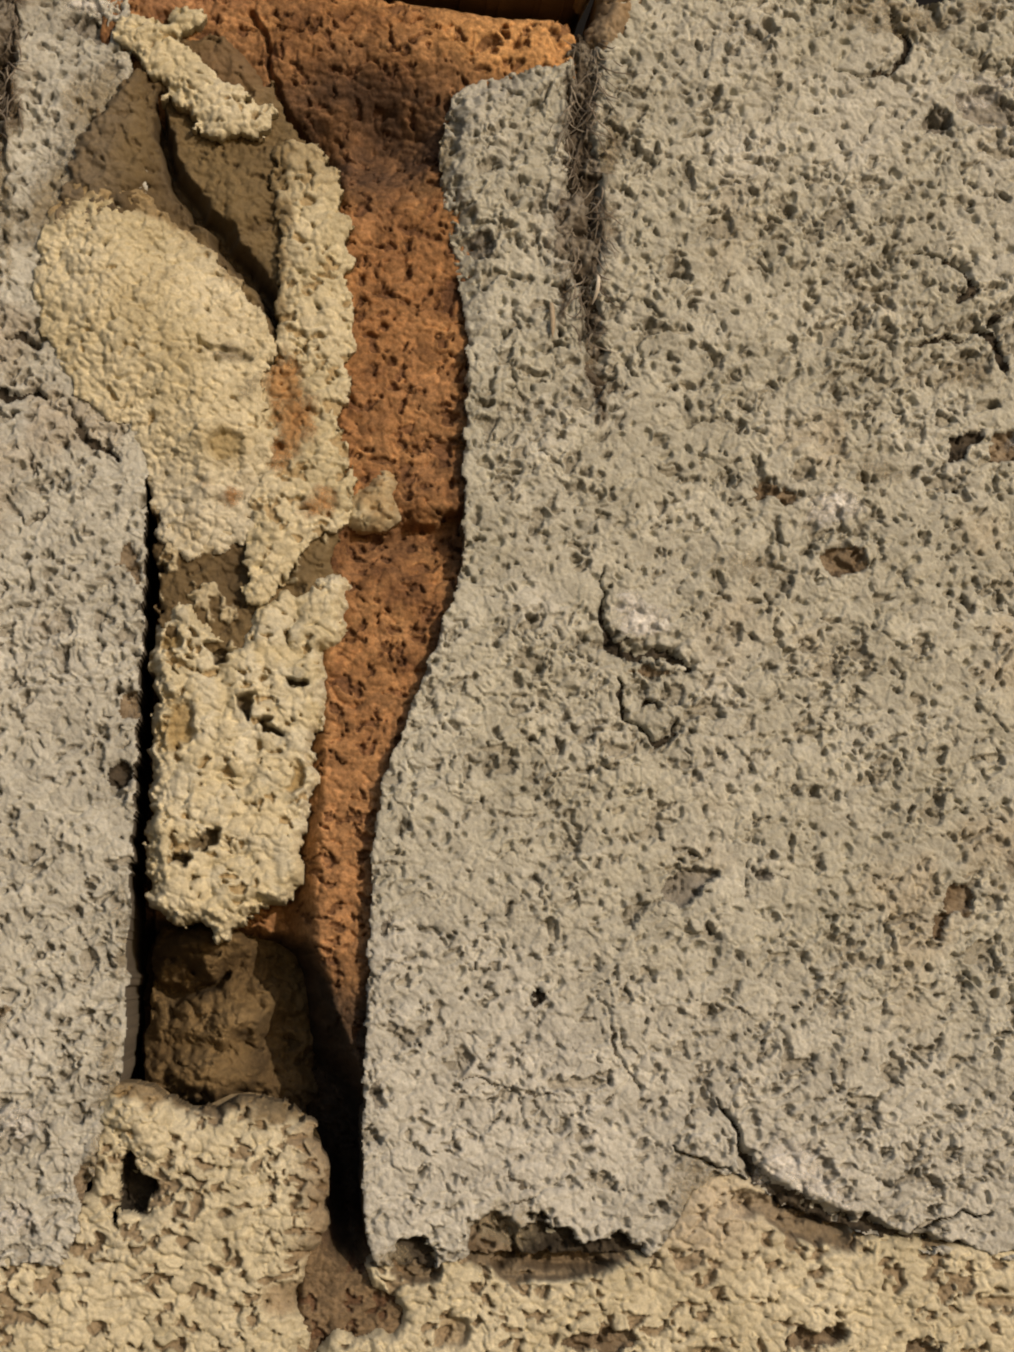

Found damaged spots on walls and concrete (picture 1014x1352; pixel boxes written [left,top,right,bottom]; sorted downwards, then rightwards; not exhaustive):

crack [840,13,912,79]
spalling [115,531,143,584]
crack [598,569,692,750]
spalling [107,761,134,789]
spalling [369,1079,392,1109]
spalling [106,1150,159,1229]
crack [683,1107,1001,1259]
spalling [392,1236,438,1267]
spalling [468,1196,644,1254]
spalling [561,1326,639,1352]
spalling [785,1316,854,1351]
spalling [905,1339,954,1352]